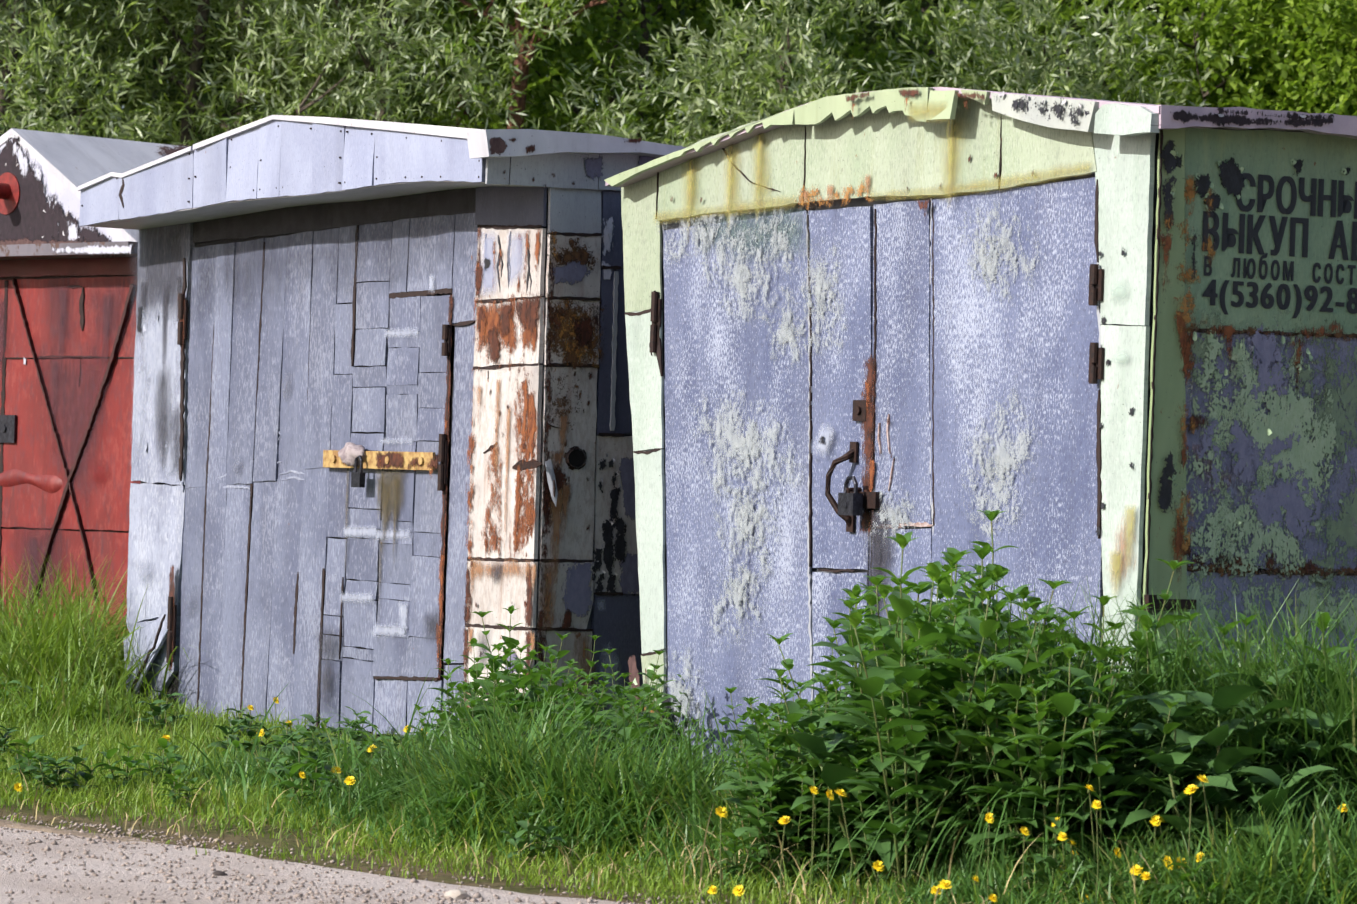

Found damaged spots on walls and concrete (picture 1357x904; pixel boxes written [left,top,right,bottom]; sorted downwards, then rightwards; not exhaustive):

peeling [997,91,1082,127]
peeling [1170,107,1334,128]
peeling [0,136,133,256]
corrosion [795,176,870,209]
corrosion [1160,176,1356,389]
corrosion [376,295,453,678]
corrosion [461,226,605,715]
peeling [562,453,639,617]
corrosion [861,508,874,533]
corrosion [861,355,892,492]
peeling [1158,313,1357,669]